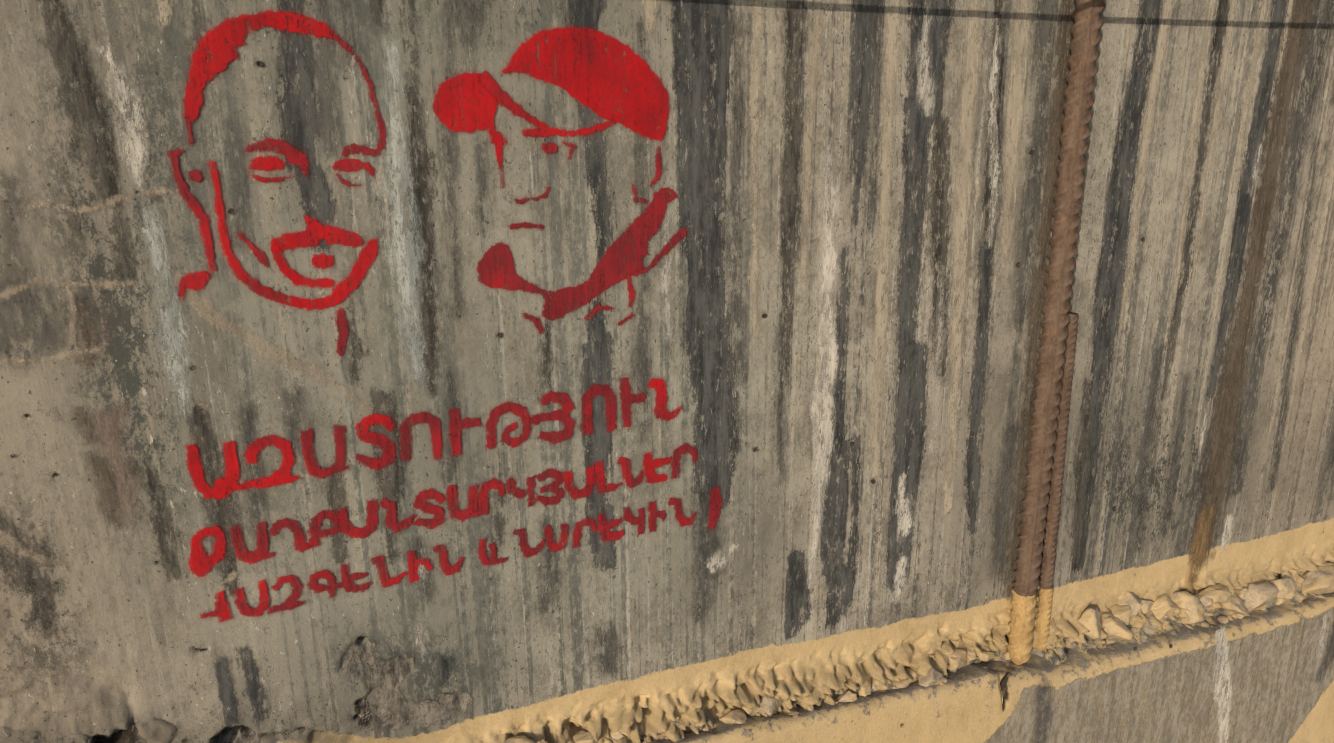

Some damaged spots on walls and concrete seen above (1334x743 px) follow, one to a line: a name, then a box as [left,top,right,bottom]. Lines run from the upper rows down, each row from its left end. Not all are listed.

water stain [542,323,554,404]
water stain [633,0,763,622]
water stain [775,0,1058,639]
rust [1004,0,1076,597]
water stain [1071,0,1173,571]
rust [1183,0,1316,595]
spalling [93,725,138,743]
spalling [211,725,261,743]